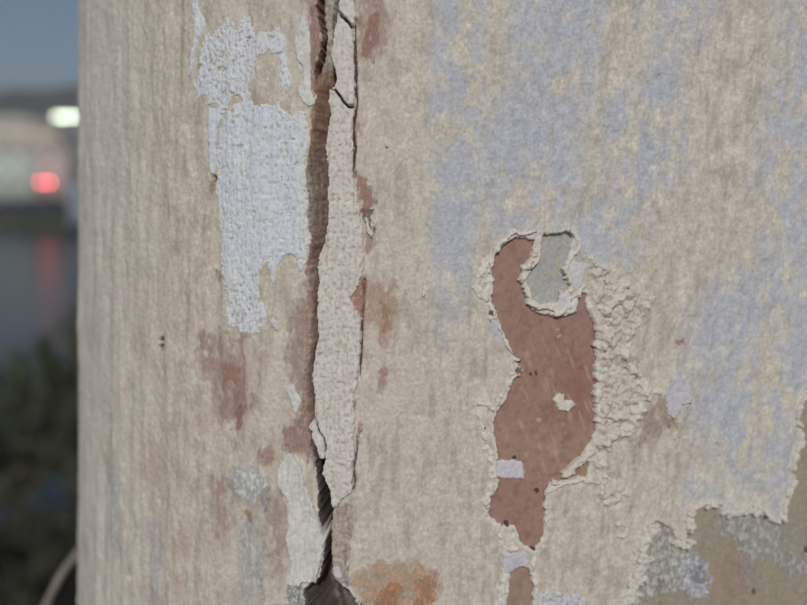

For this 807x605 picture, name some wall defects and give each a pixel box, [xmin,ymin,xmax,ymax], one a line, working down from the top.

peeling [188,0,376,605]
crack [301,0,359,588]
crack [358,283,366,375]
peeling [471,229,602,605]
peeling [664,369,692,419]
peeling [618,393,807,605]